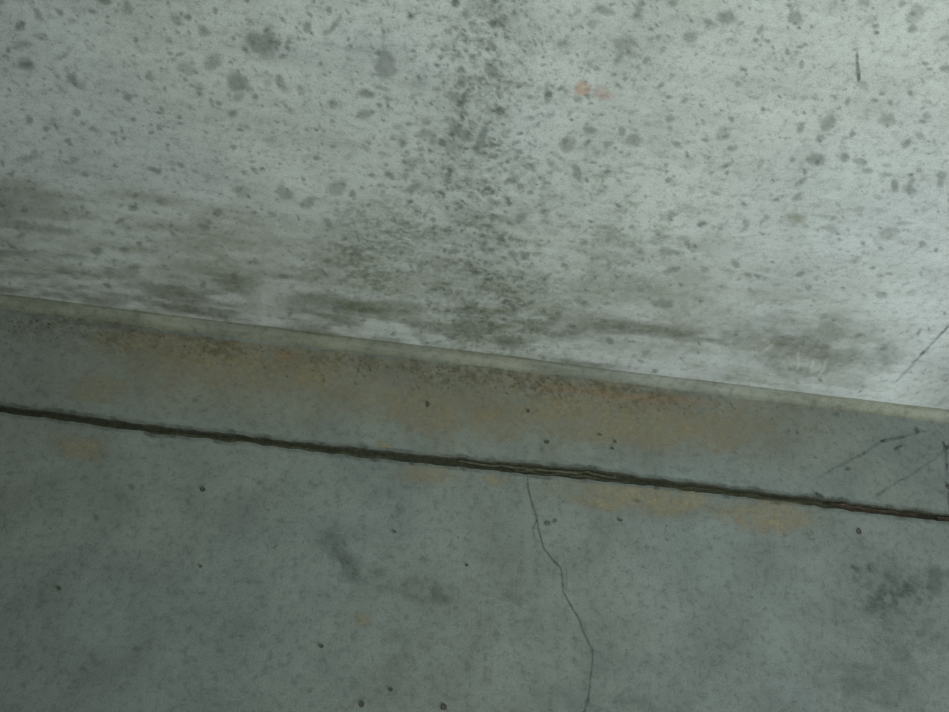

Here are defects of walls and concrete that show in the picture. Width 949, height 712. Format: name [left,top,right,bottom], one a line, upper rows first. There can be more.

crack [0,405,949,522]